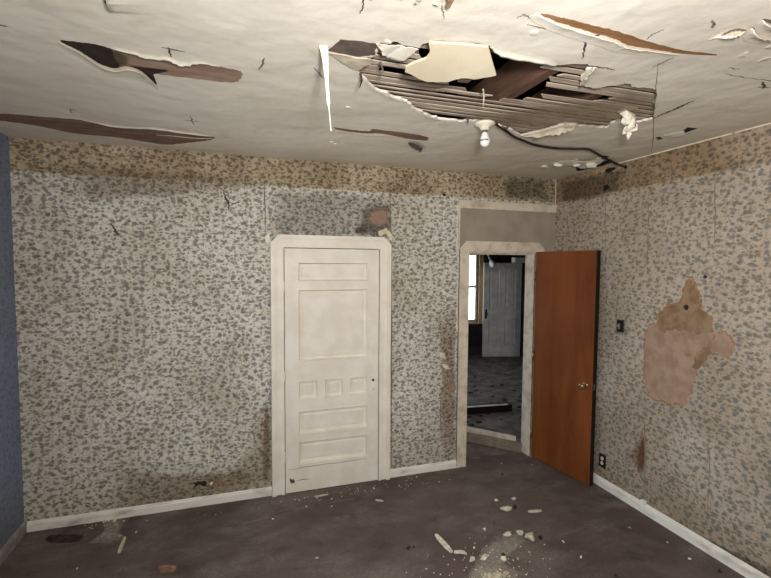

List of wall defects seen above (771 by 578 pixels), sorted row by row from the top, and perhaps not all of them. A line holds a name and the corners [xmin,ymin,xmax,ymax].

peeling [709,19,771,62]
peeling [57,40,243,89]
crack [517,13,771,153]
peeling [0,114,217,145]
peeling [333,127,429,152]
peeling [619,109,638,140]
flaking render [643,275,736,406]